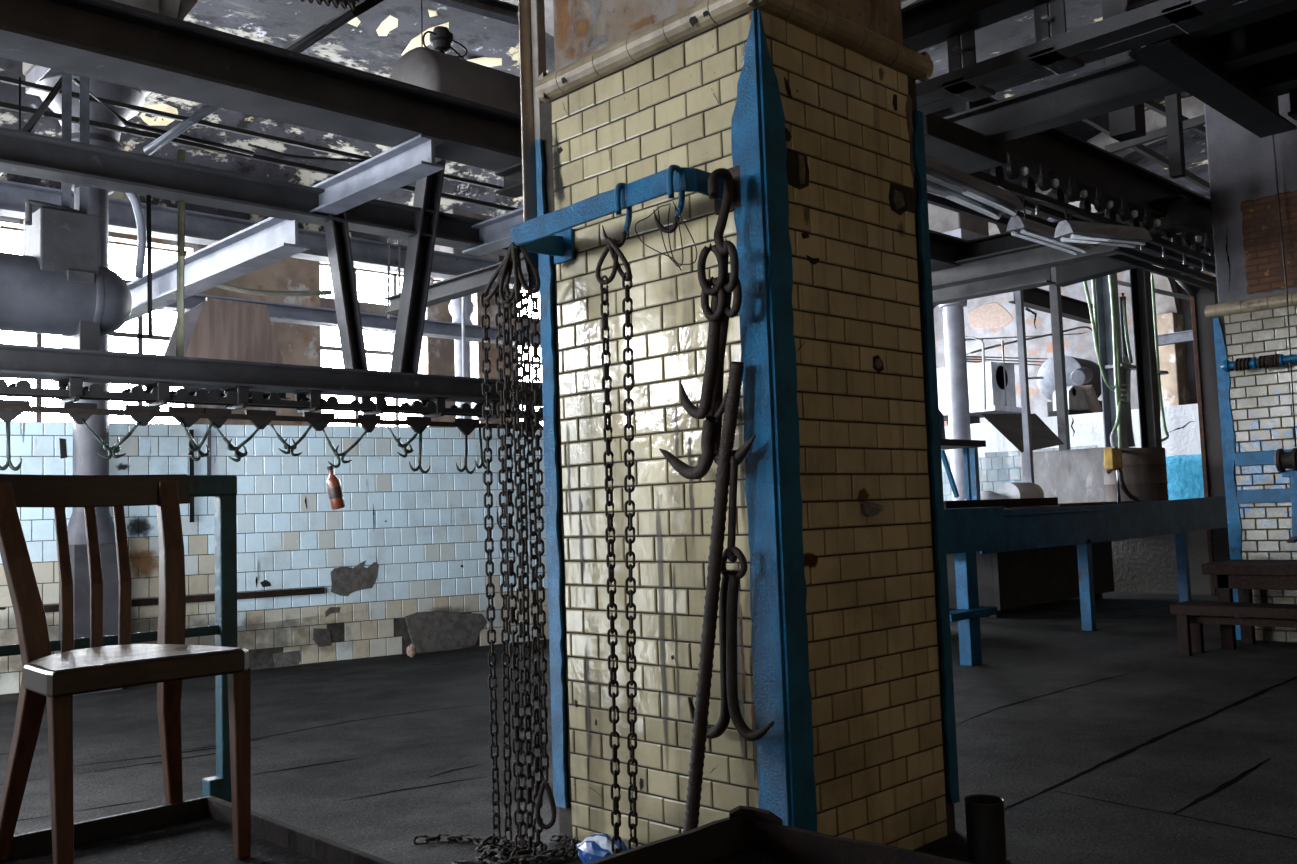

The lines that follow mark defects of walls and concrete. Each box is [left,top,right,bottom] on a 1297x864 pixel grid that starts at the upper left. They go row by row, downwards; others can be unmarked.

peeling [376,15,398,36]
peeling [401,9,449,56]
peeling [140,104,178,126]
flaking render [1240,190,1297,295]
damp [566,429,584,572]
spalling [313,560,379,647]
damp [656,511,679,745]
damp [737,592,759,783]